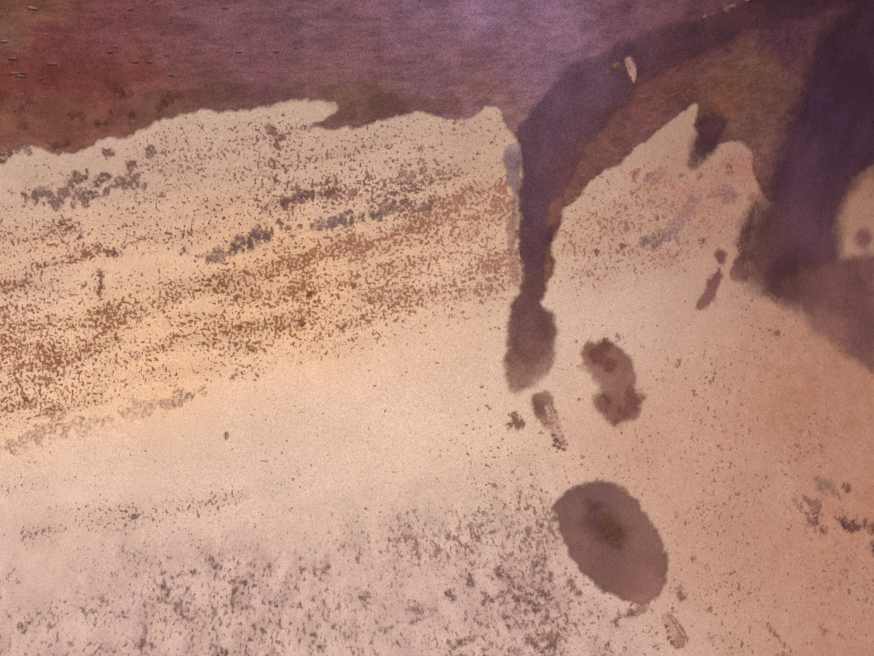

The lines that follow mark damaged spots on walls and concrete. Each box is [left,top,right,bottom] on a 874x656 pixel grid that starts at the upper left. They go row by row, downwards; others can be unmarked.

rust [0,111,522,431]
leakage [0,0,874,390]
leakage [582,335,645,424]
leakage [89,546,278,656]
leakage [241,584,410,656]
leakage [368,463,668,656]